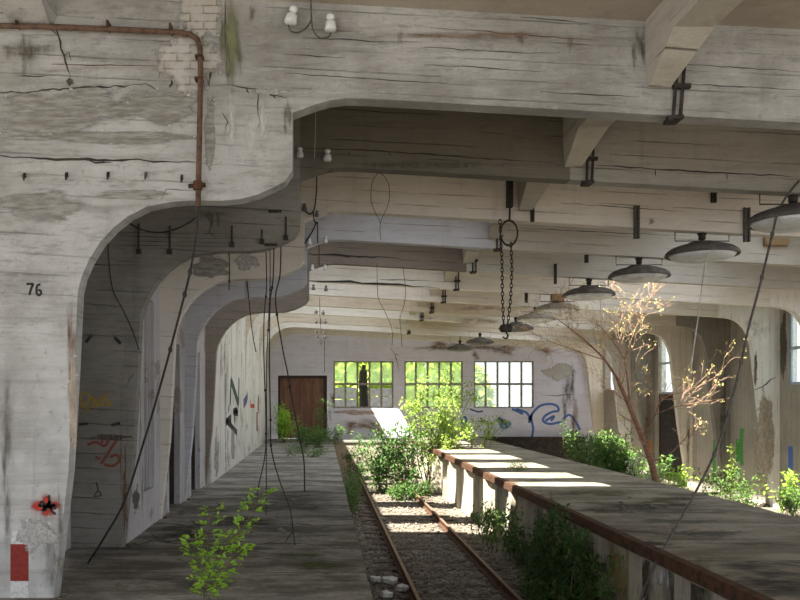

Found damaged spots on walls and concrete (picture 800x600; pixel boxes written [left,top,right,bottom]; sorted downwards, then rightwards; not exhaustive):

crack [0,23,173,94]
peeling [98,0,223,169]
crack [0,155,192,164]
crack [598,165,789,177]
peeling [754,397,774,489]
peeling [16,518,58,552]